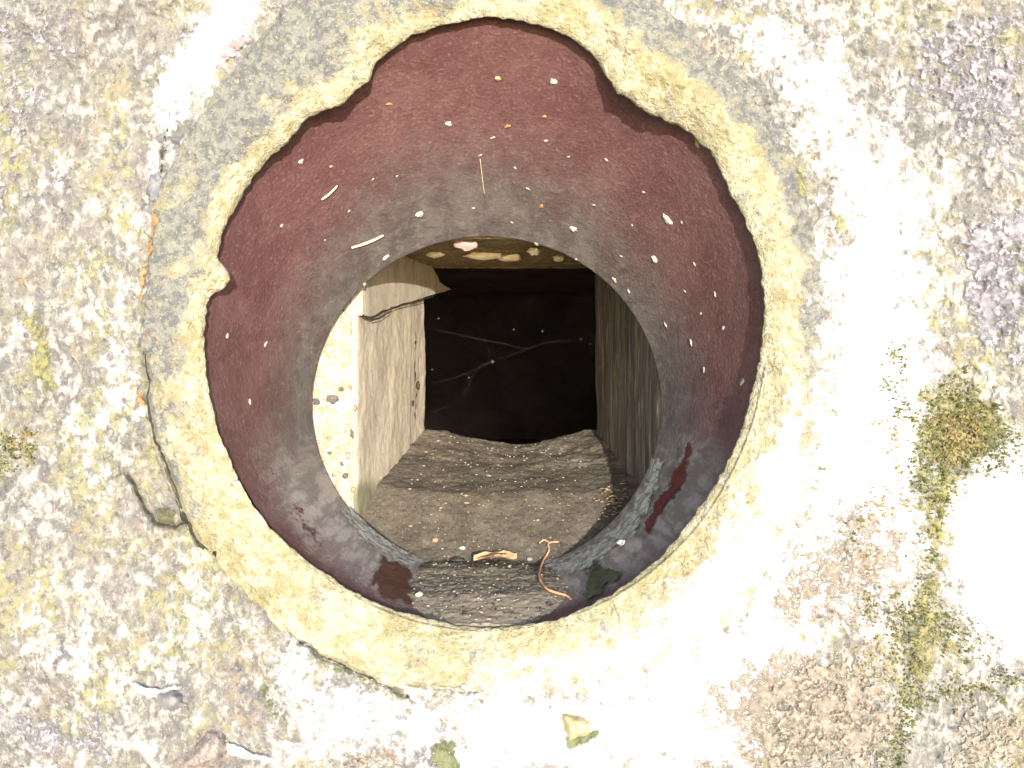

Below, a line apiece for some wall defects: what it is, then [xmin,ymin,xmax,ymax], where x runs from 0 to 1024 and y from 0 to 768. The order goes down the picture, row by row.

crack [160,112,170,172]
crack [126,354,216,557]